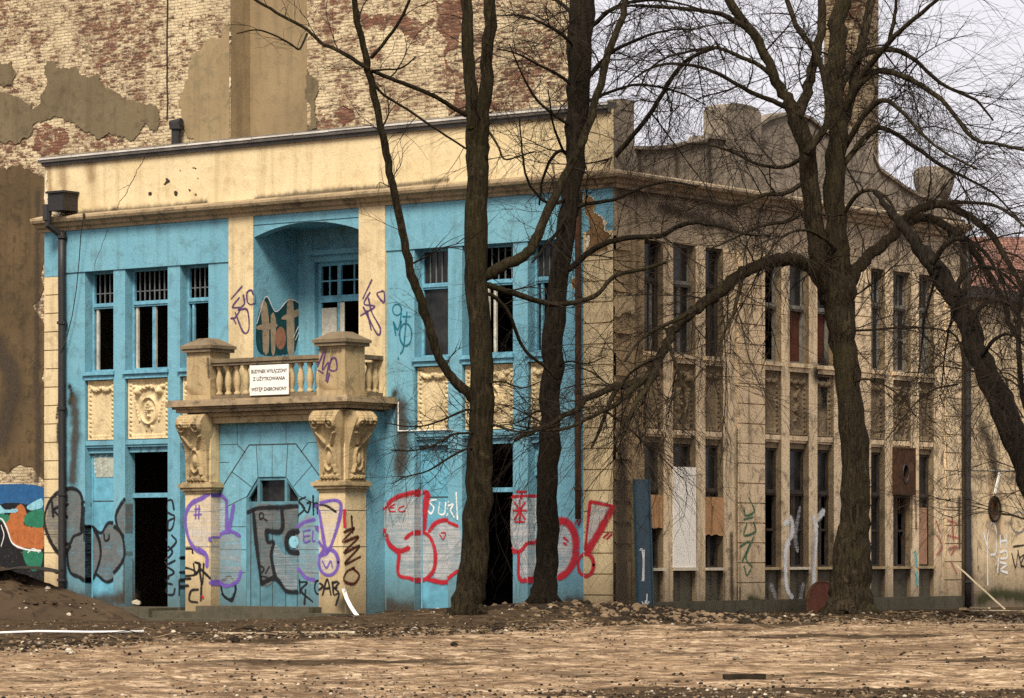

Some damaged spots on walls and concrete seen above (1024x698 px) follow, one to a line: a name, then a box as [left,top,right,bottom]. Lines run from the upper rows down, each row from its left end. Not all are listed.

flaking render [337,107,356,127]
flaking render [32,123,69,215]
spalling [583,193,613,255]